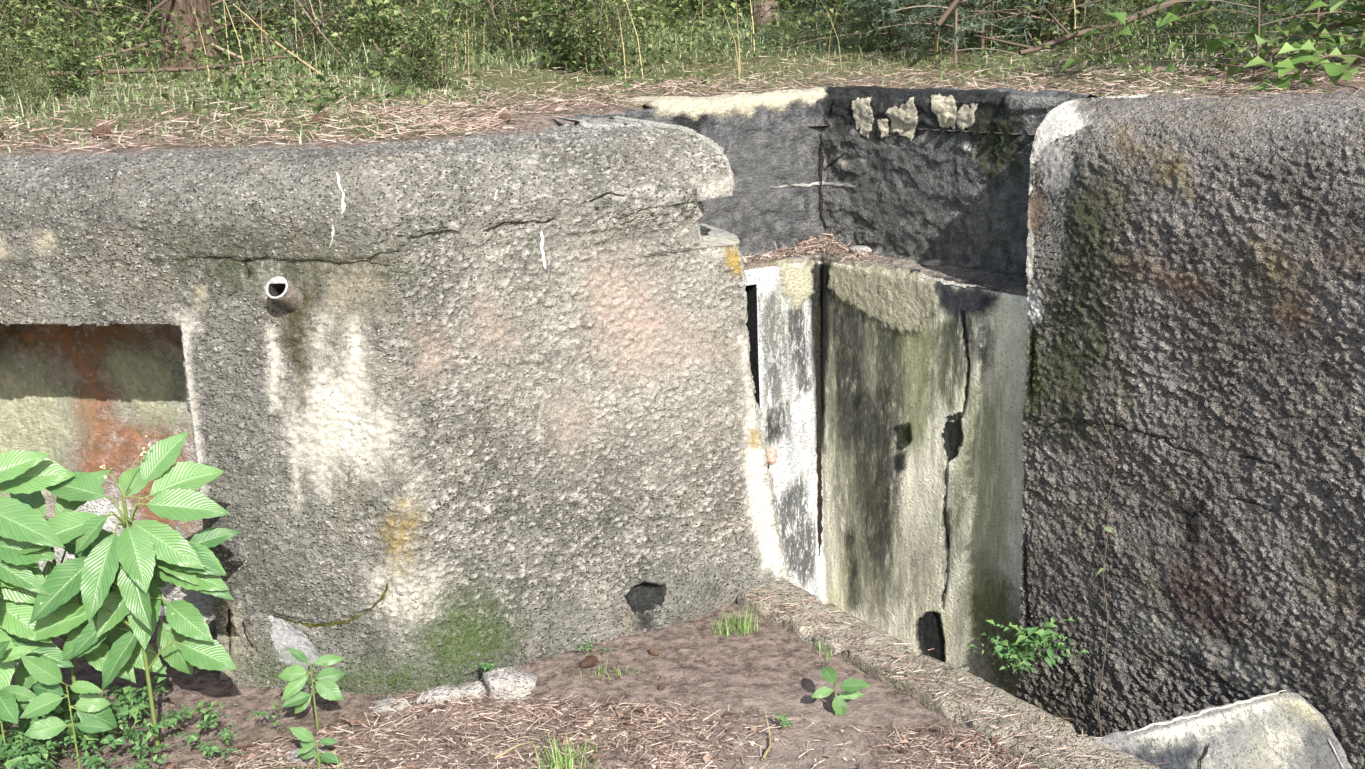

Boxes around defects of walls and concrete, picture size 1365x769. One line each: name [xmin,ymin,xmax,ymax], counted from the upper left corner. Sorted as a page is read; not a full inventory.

crack [185,216,559,278]
crack [589,192,624,201]
corrosion [6,324,183,486]
corrosion [133,479,187,530]
damp [268,266,392,492]
peeling [553,86,986,582]
damp [766,407,787,442]
damp [773,479,815,585]
damp [789,306,810,392]
damp [833,302,889,610]
peeling [917,313,970,663]
damp [935,310,986,406]